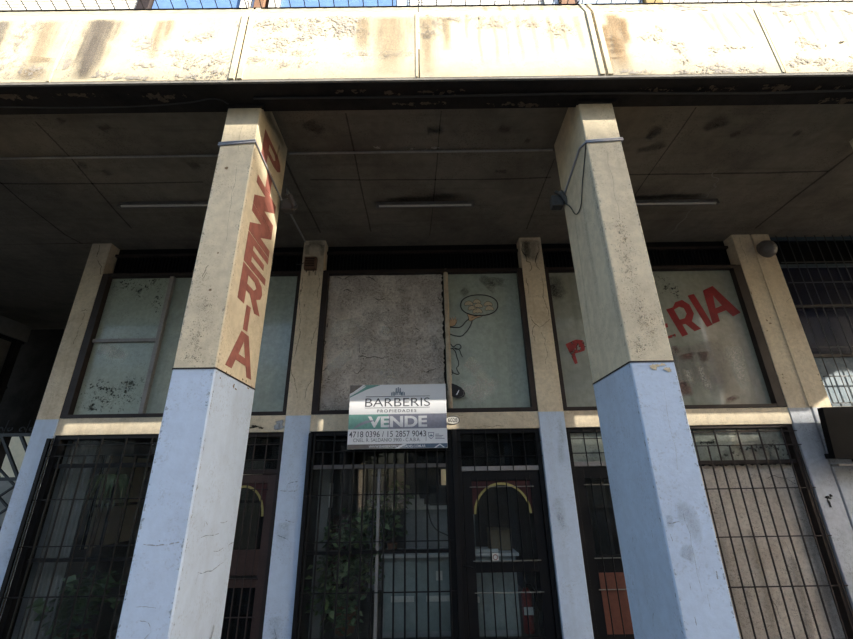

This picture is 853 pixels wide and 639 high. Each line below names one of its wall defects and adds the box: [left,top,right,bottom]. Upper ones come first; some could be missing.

water stain [80,20,114,73]
peeling [92,15,382,80]